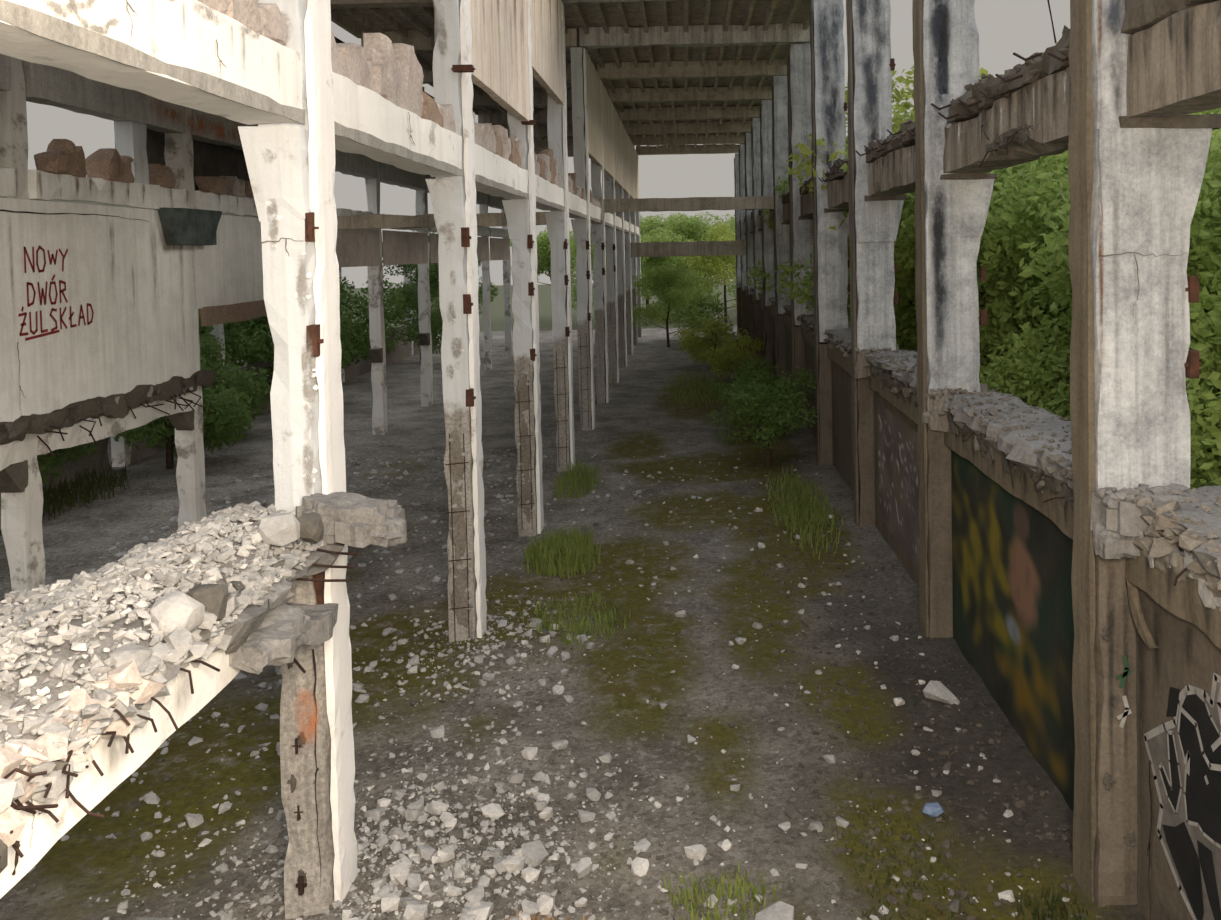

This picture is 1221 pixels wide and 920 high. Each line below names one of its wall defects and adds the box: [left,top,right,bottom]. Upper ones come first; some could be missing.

damp [865,36,882,140]
damp [931,0,950,102]
spalling [931,0,1069,120]
damp [933,197,946,339]
spalling [947,389,1074,512]
spalling [1131,488,1221,612]
spalling [0,548,360,876]